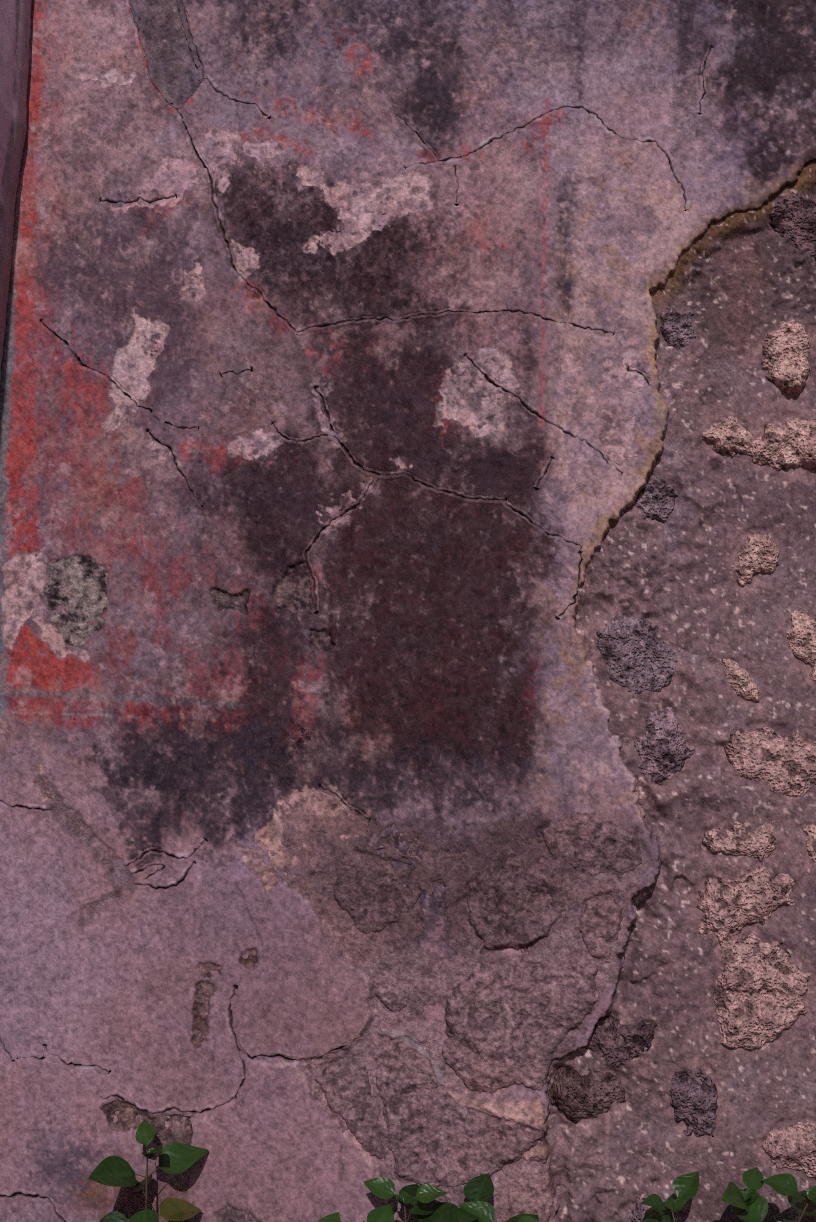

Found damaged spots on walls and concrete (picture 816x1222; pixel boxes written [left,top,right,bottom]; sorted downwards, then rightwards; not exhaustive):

peeling [296,165,434,255]
crack [172,108,615,338]
crack [395,102,690,211]
damp [37,208,201,378]
peeling [106,307,171,432]
damp [93,162,557,866]
crack [269,352,625,620]
spalling [0,550,109,662]
damp [380,832,455,940]
crack [0,987,362,1119]
spalling [191,961,221,1049]
spalling [238,785,655,1222]